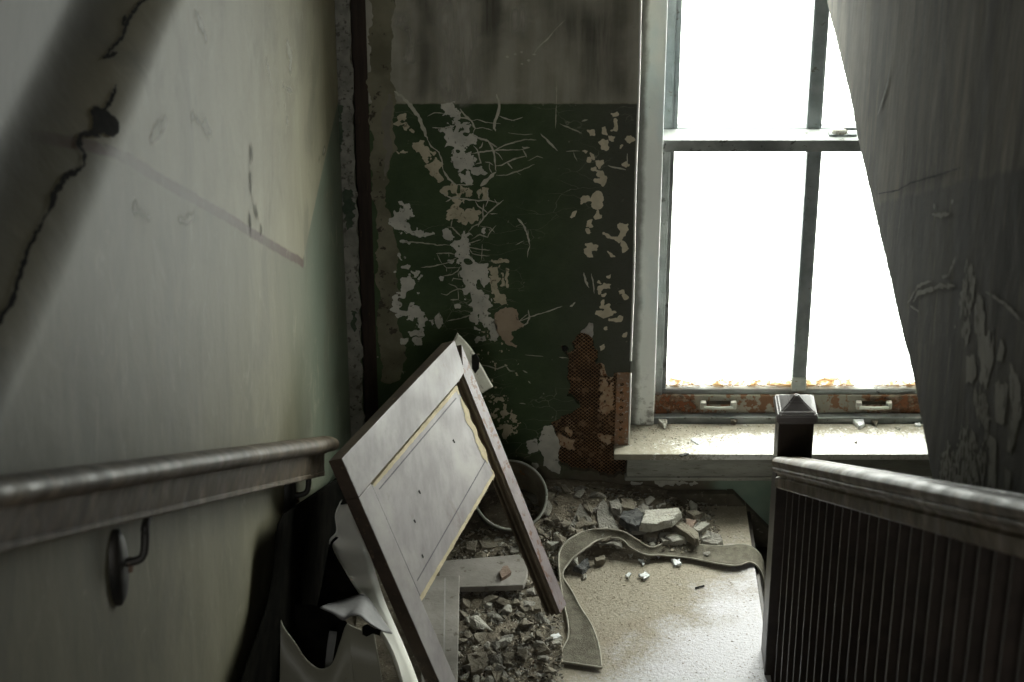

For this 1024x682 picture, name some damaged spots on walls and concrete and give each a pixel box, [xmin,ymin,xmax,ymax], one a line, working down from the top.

crack [103,0,145,59]
crack [0,84,119,325]
flaking render [366,0,698,487]
corrosion [654,377,795,414]
corrosion [806,376,855,387]
corrosion [863,380,920,414]
peeling [939,258,1022,490]